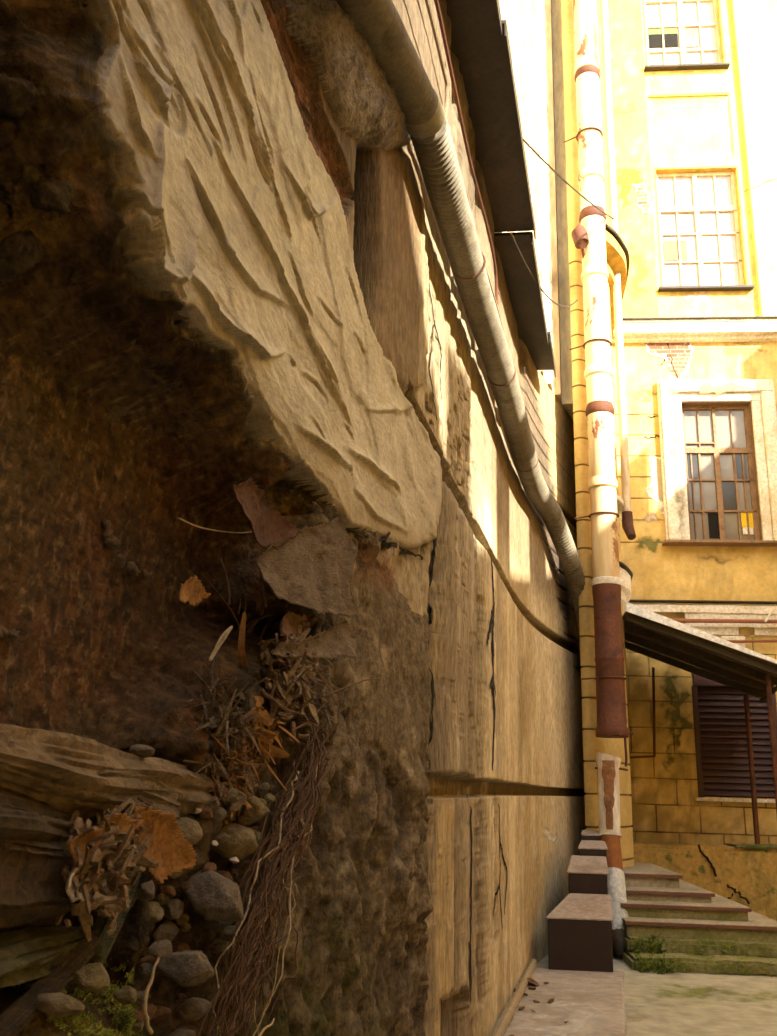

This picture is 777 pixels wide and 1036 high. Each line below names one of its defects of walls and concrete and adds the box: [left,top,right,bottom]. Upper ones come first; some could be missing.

flaking render [632,183,653,214]
flaking render [642,342,694,380]
flaking render [644,456,664,522]
rust [592,583,629,738]
crack [466,557,508,1003]
rust [602,760,616,830]
crack [698,844,750,905]